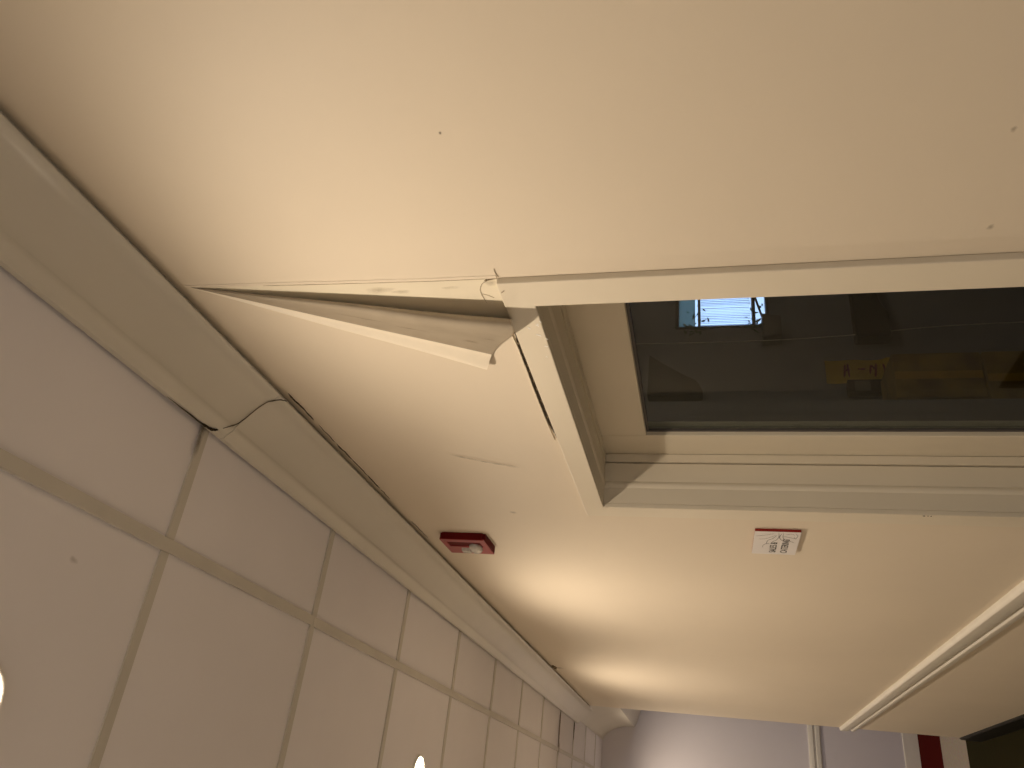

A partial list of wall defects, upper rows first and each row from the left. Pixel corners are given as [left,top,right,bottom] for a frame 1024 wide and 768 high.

peeling [187,278,515,370]
crack [512,332,557,440]
crack [225,393,390,499]